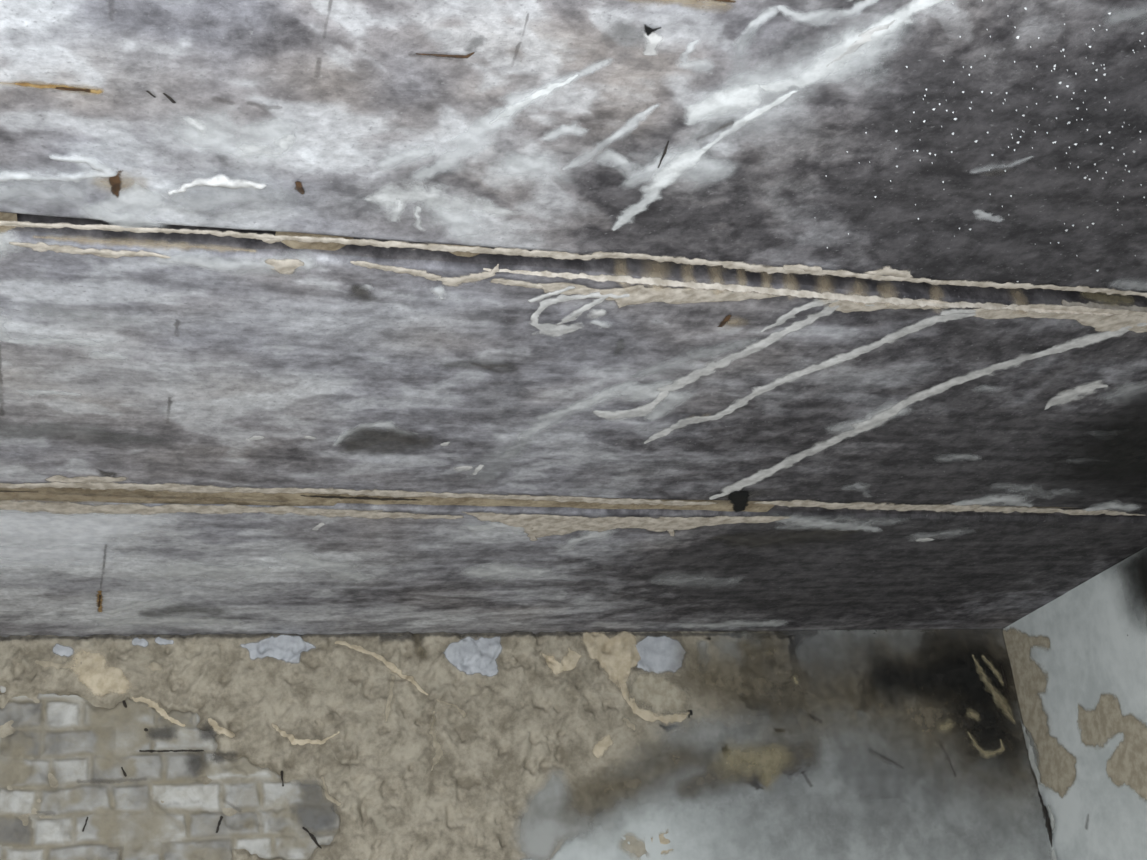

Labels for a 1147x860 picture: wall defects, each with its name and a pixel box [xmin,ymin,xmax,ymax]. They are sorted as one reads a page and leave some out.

water stain [183,116,294,154]
water stain [366,61,608,230]
water stain [563,0,943,231]
water stain [0,206,1147,565]
peeling [132,637,174,647]
flaking render [0,644,342,860]
peeling [241,635,315,663]
peeling [444,637,502,677]
water stain [0,598,1031,835]
peeling [520,628,1076,860]
peeling [1077,694,1147,800]
water stain [1120,546,1147,608]